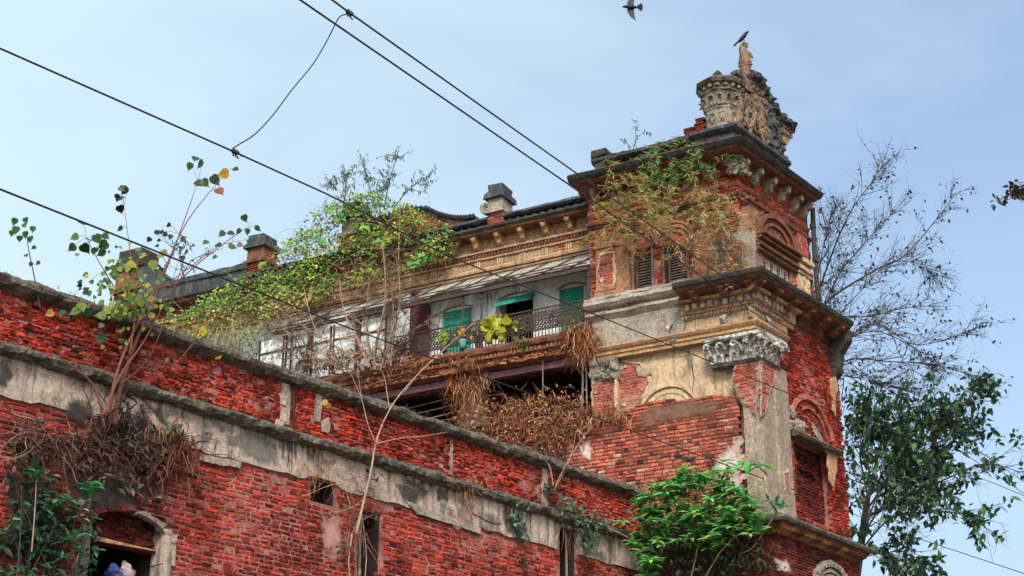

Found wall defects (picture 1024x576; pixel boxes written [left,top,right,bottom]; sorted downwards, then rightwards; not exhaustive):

water stain [0,360,13,386]
water stain [67,400,92,422]
spalling [0,290,642,535]
flaking render [591,359,652,419]
flaking render [731,356,779,418]
peeling [829,377,838,417]
peeling [794,416,839,490]
water stain [397,475,464,504]